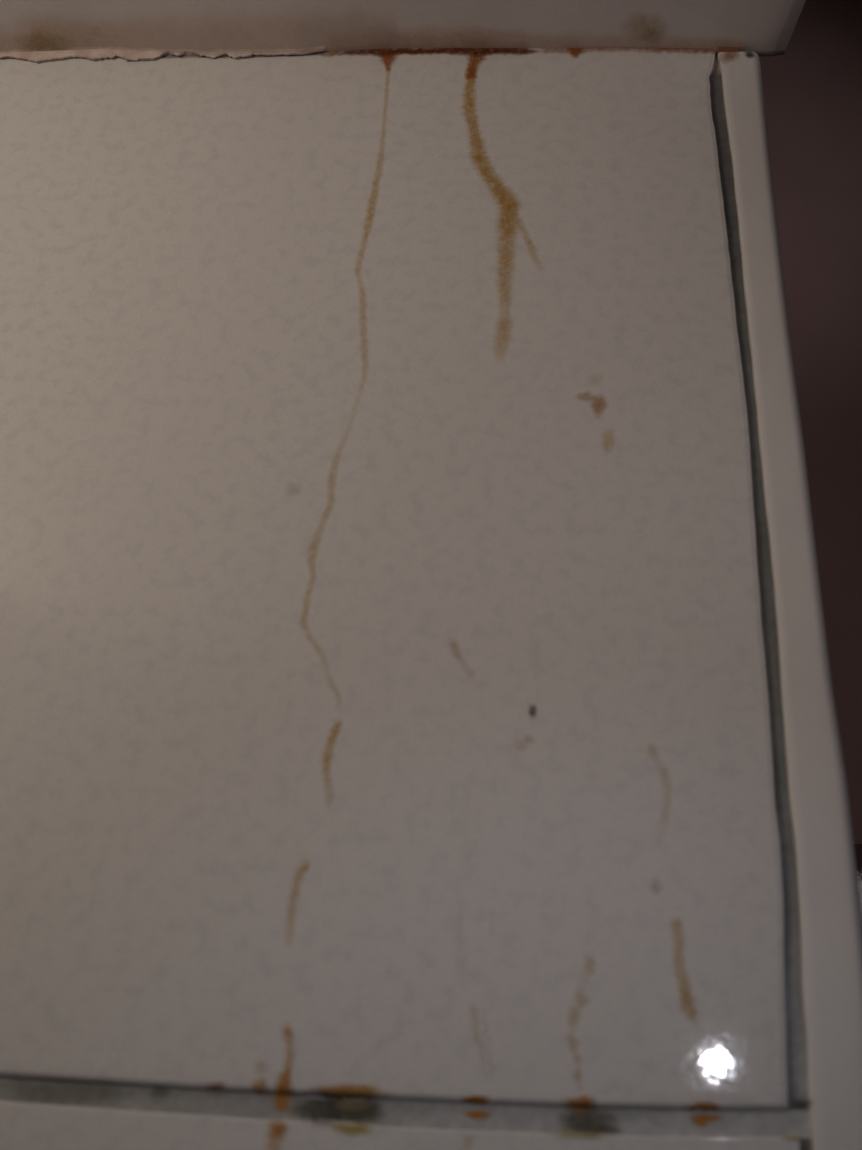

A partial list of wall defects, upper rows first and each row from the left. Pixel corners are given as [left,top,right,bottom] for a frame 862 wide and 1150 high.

rust [464,52,518,295]
rust [255,1069,292,1109]
rust [465,1096,488,1118]
rust [690,1102,719,1126]